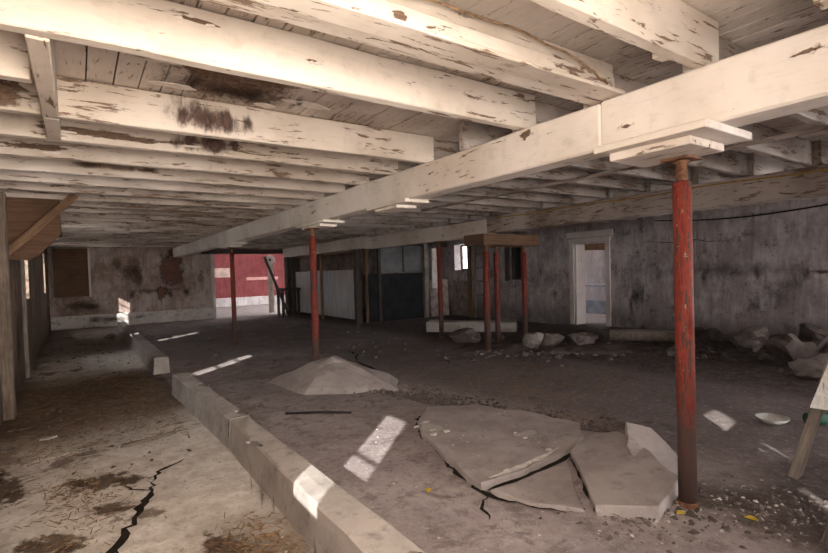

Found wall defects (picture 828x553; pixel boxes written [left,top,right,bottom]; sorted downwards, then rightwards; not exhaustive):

peeling [388,10,410,23]
peeling [124,53,331,111]
damp [174,101,252,153]
peeling [156,249,184,300]
crack [415,416,594,520]
crack [106,459,183,553]